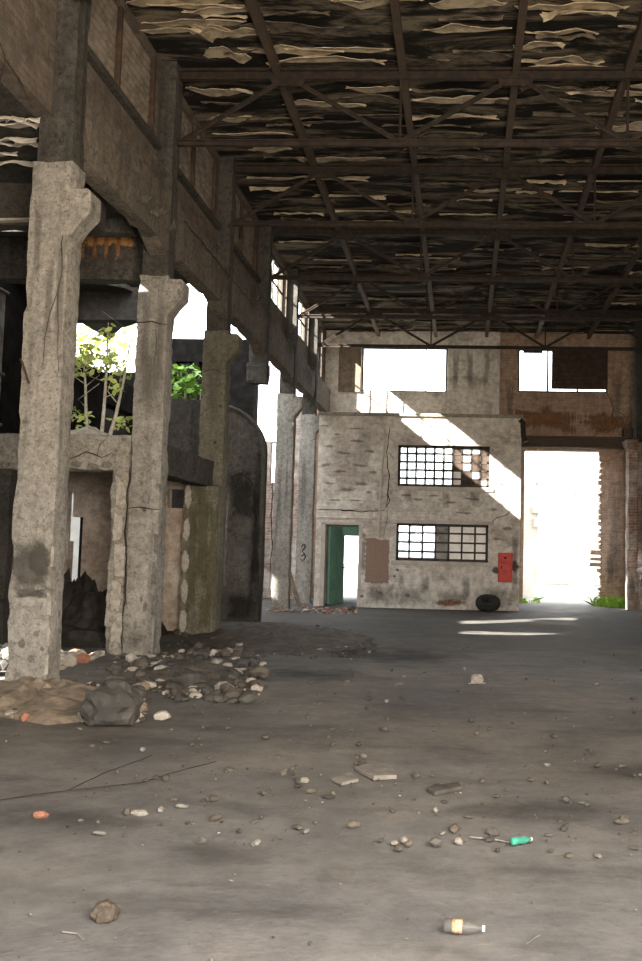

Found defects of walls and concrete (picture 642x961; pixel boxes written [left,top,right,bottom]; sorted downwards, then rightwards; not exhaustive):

peeling [125,0,637,68]
peeling [0,116,40,167]
peeling [185,84,642,163]
peeling [245,174,642,222]
peeling [295,242,460,270]
peeling [320,297,558,332]
damp [17,589,44,598]
flaking render [0,461,270,704]
crack [1,755,216,800]